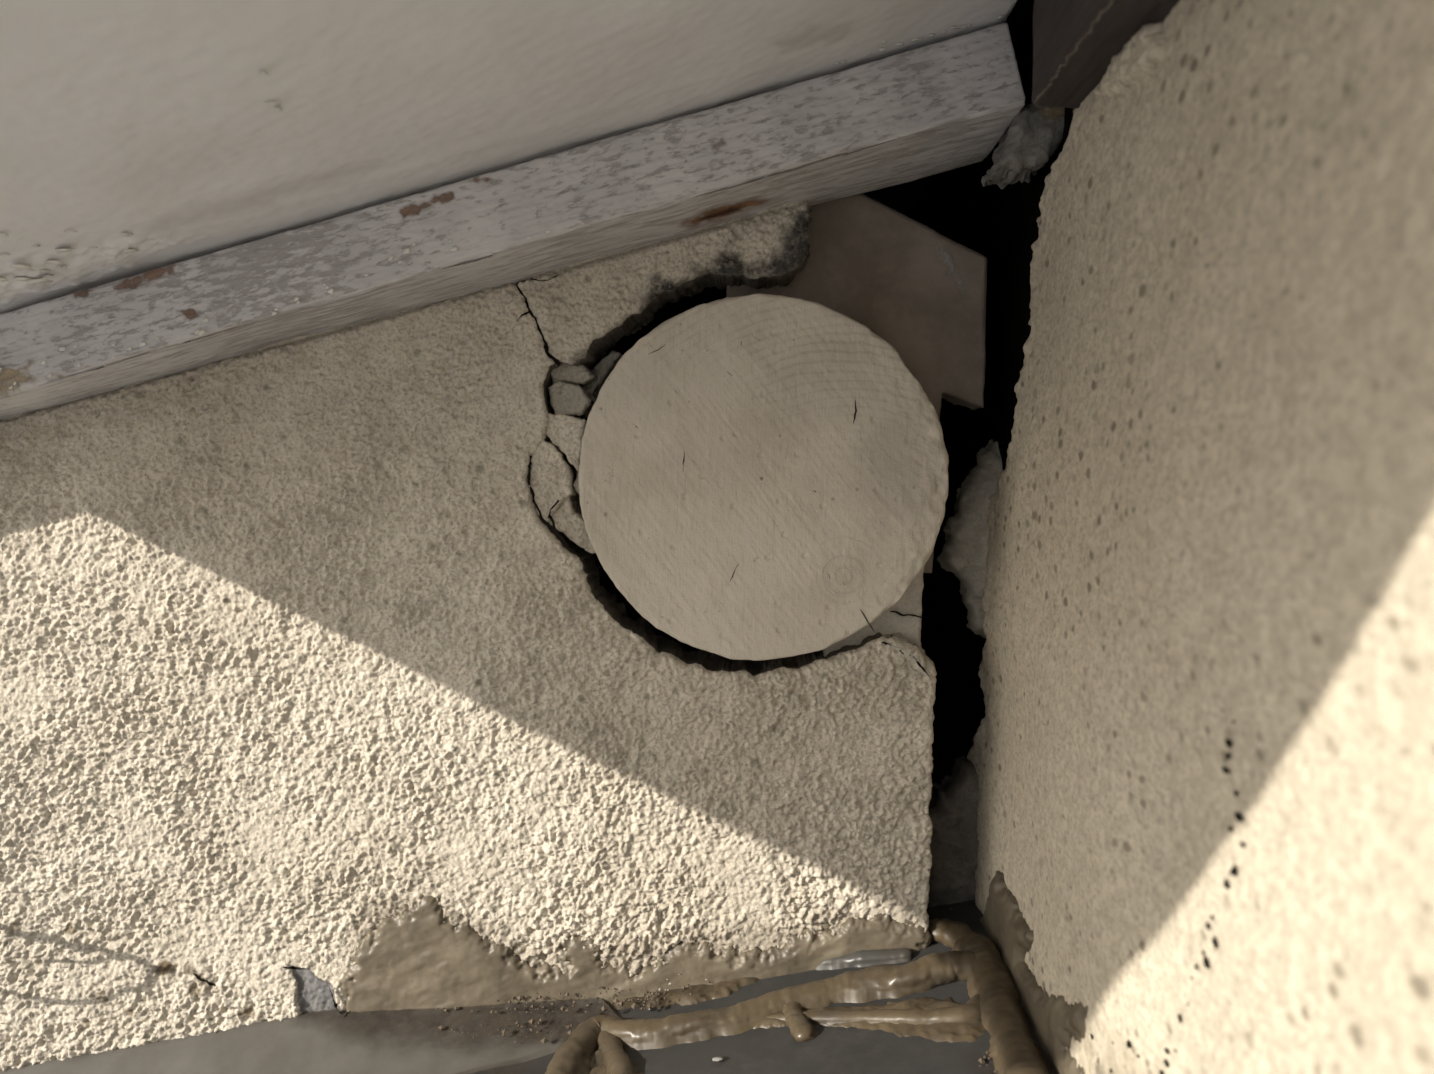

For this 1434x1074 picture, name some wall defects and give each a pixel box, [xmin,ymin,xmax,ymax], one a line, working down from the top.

rust [690,201,766,226]
crack [516,275,560,366]
crack [527,456,569,548]
spalling [292,966,339,1013]